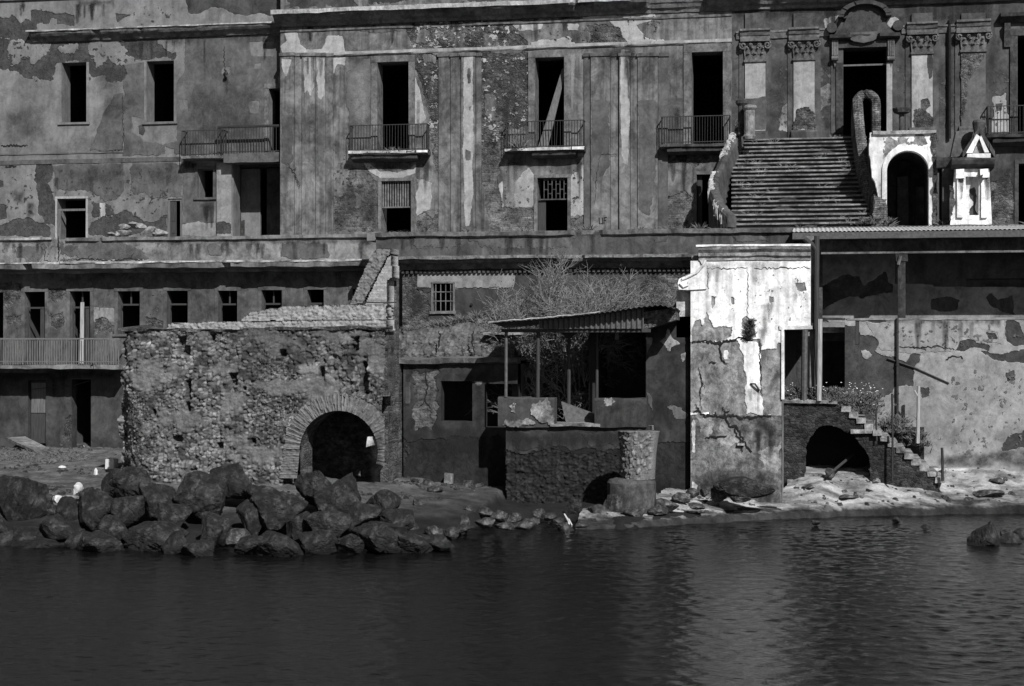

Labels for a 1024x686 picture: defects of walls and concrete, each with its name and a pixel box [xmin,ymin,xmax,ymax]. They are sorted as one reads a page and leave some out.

peeling [0,10,684,261]
flaking render [746,68,831,132]
flaking render [883,53,1014,226]
flaking render [404,369,555,487]
crack [692,266,810,452]
flaking render [646,252,1024,503]